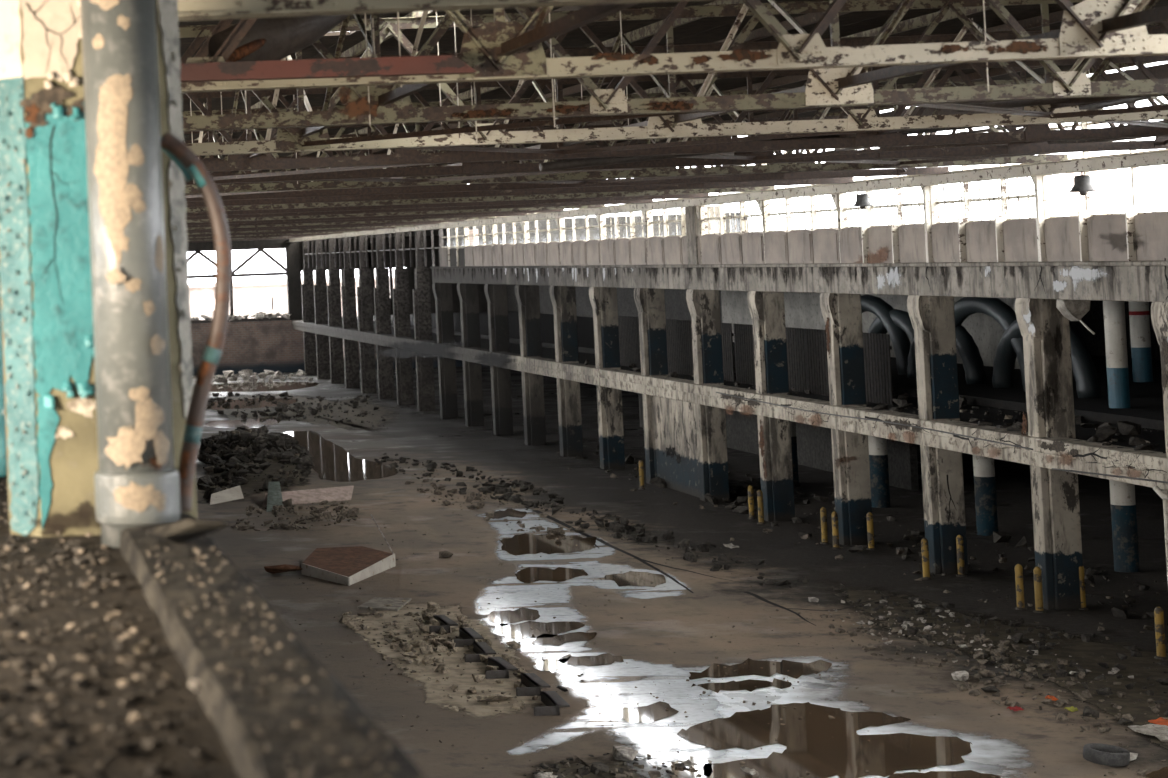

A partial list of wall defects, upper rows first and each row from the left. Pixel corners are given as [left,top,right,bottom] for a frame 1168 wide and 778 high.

corrosion [591,52,659,65]
corrosion [691,49,773,65]
peeling [0,0,155,536]
spalling [1056,299,1095,335]
peeling [104,386,190,512]